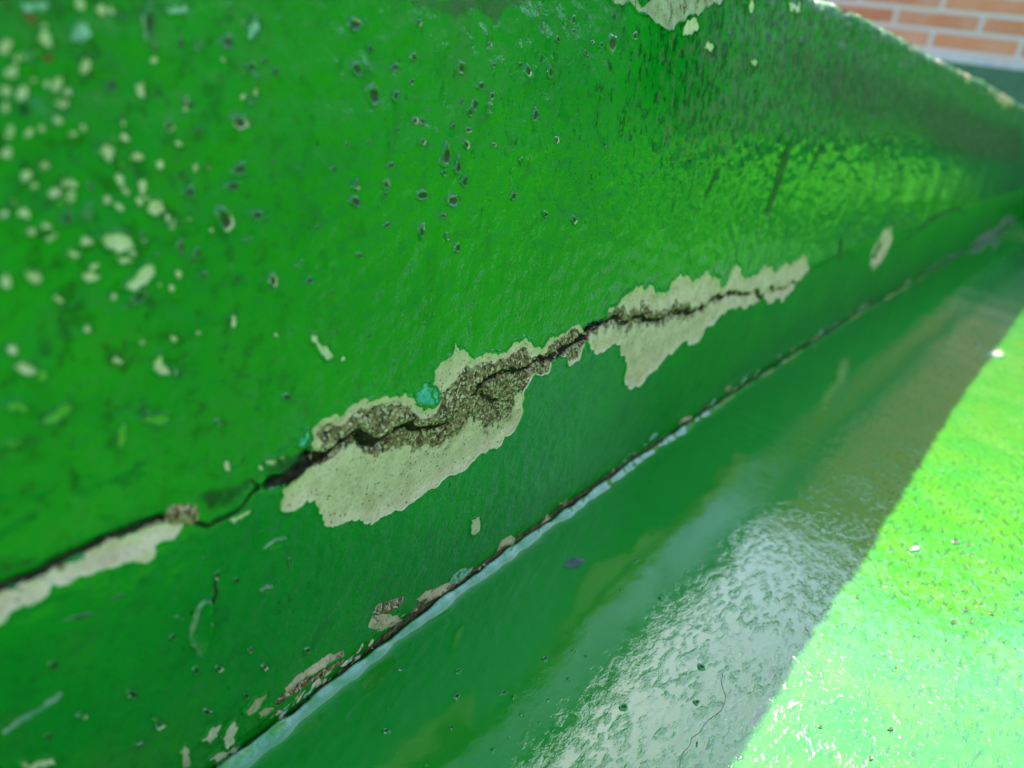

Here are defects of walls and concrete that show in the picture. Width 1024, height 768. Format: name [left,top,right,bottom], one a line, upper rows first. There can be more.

spalling [609,0,726,54]
peeling [0,0,211,309]
spalling [439,81,495,218]
spalling [208,204,236,236]
spalling [868,225,893,271]
peeling [3,342,39,378]
peeling [149,334,179,379]
spalling [277,251,809,530]
crack [193,218,1024,749]
crack [0,516,166,592]
spalling [0,521,183,627]
spalling [177,514,553,768]